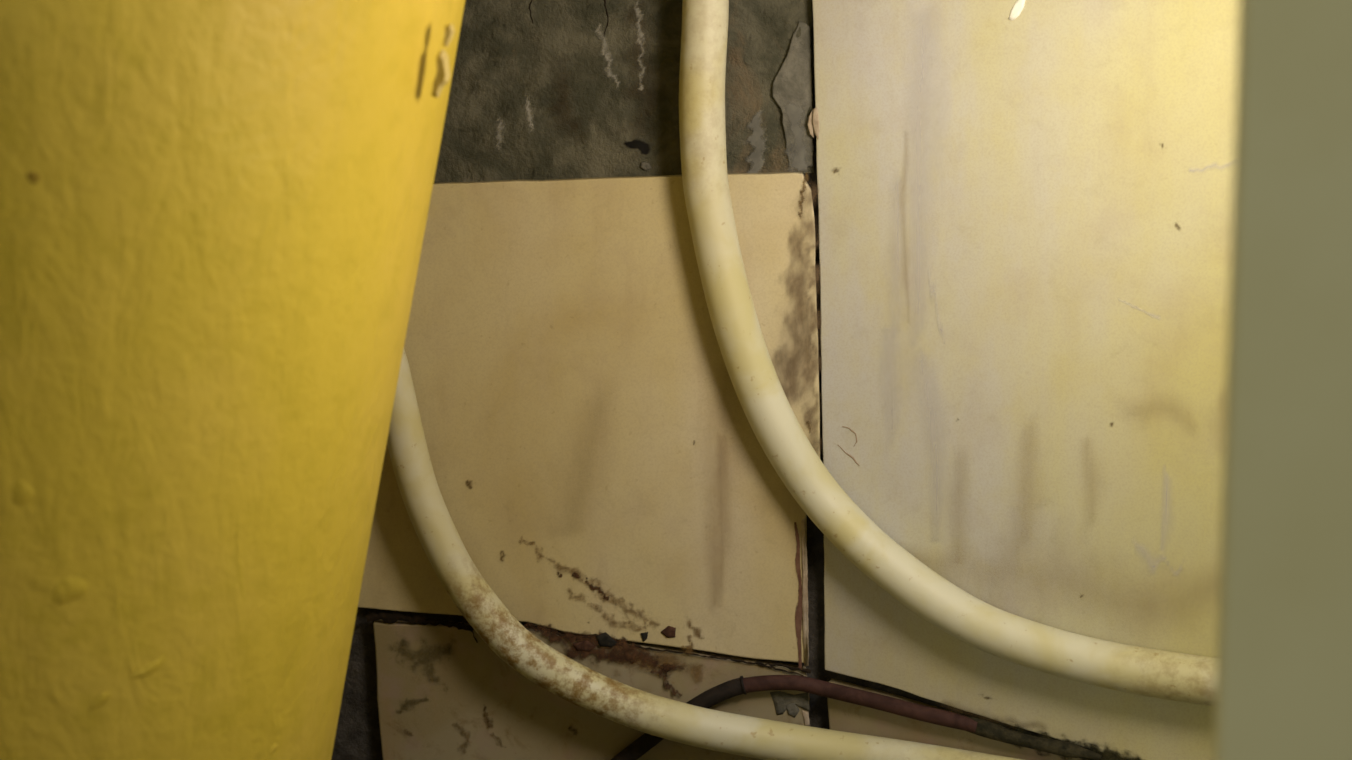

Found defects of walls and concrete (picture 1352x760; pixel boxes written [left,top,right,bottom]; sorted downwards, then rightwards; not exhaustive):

corrosion [525,565,701,696]